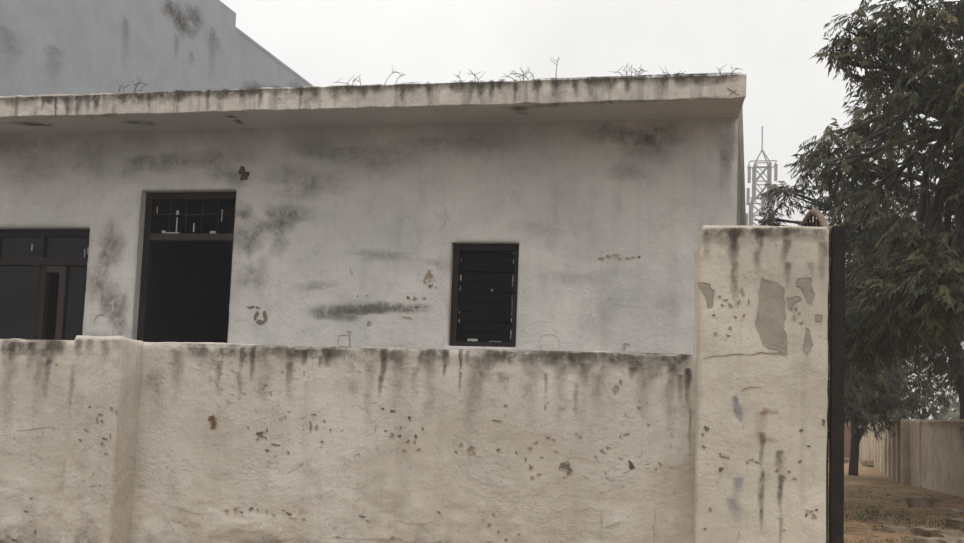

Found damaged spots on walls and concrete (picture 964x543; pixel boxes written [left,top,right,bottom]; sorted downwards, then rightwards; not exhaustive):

water stain [330,79,516,95]
water stain [534,73,737,90]
flaking render [697,277,823,355]
water stain [232,344,336,366]
crack [707,351,784,359]
water stain [522,350,691,388]